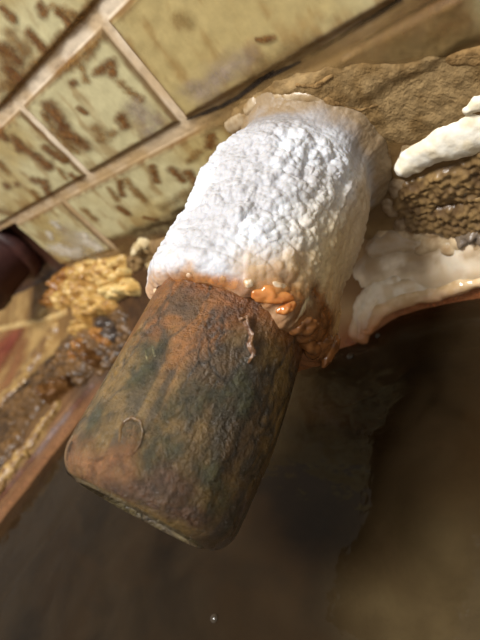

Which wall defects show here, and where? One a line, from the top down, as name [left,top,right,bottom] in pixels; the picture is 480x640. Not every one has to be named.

corrosion [171,276,239,289]
leakage [0,8,480,493]
corrosion [248,277,340,369]